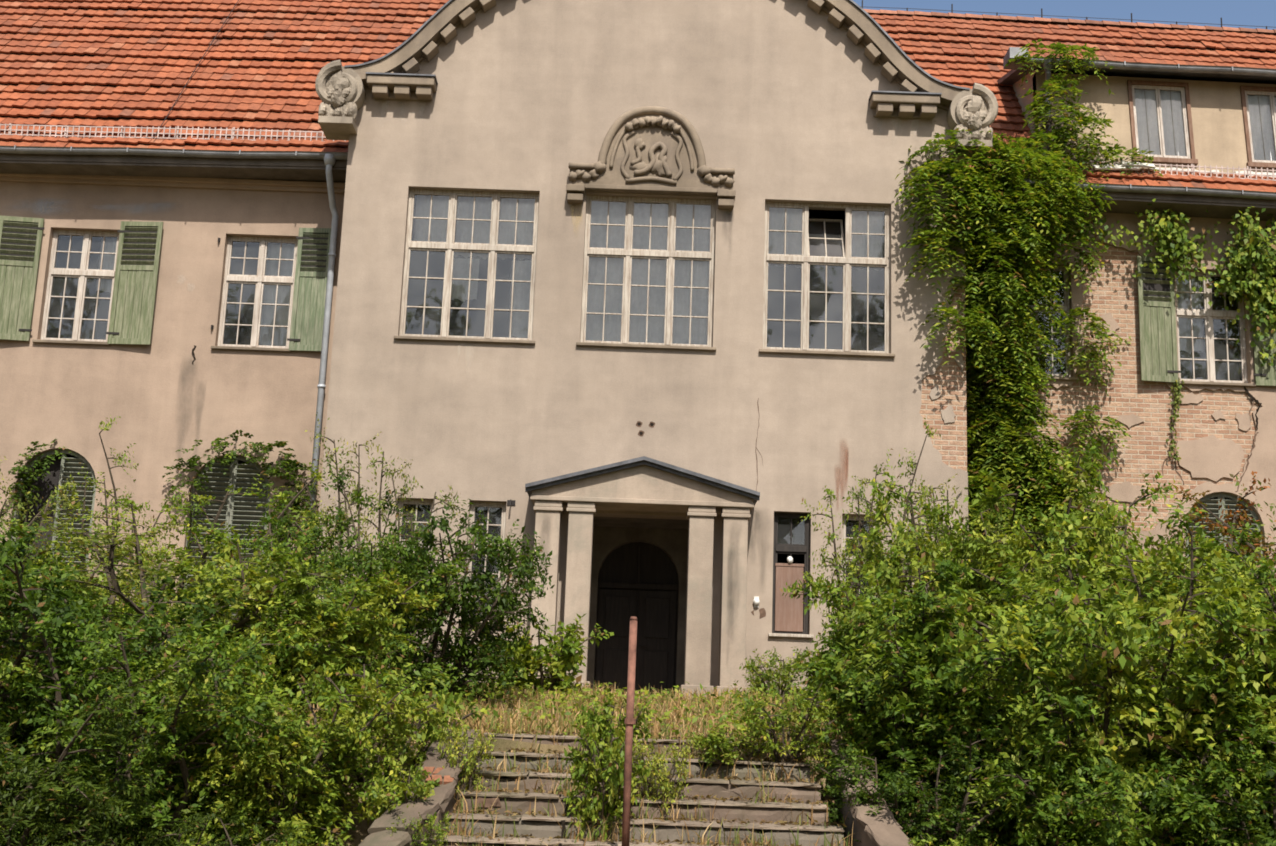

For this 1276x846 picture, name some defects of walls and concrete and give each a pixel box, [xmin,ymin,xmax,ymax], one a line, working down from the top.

crack [755,398,763,490]
spalling [920,285,967,472]
spalling [992,243,1261,536]
crack [1162,393,1184,485]
crack [1235,387,1262,492]